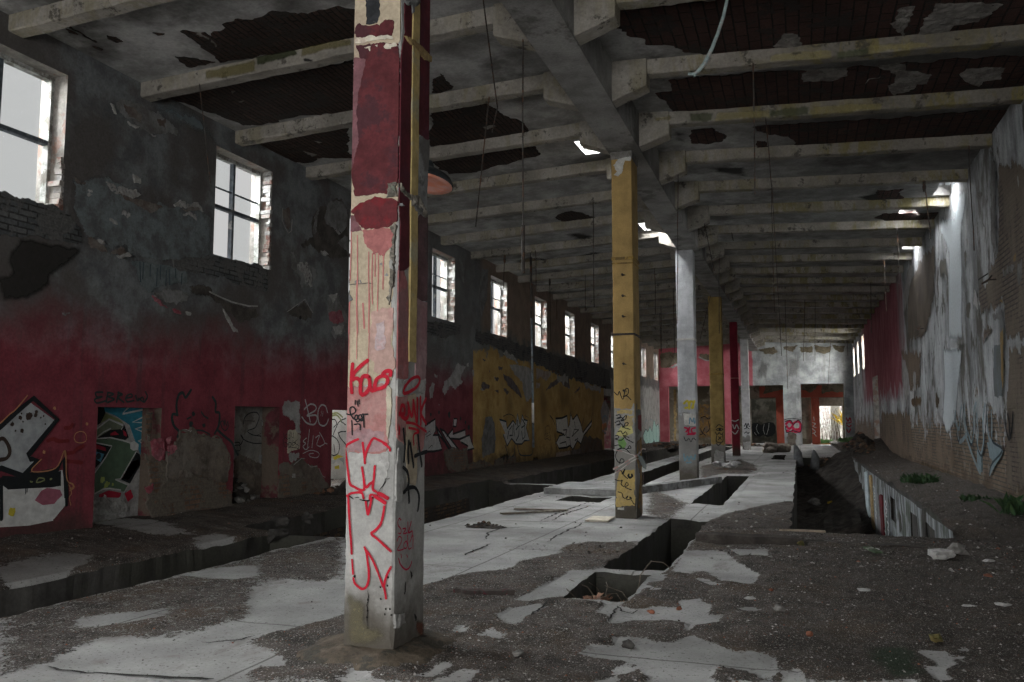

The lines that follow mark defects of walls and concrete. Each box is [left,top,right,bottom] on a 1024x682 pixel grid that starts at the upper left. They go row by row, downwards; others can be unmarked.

peeling [890,2,1003,36]
peeling [175,56,215,68]
peeling [865,63,932,95]
peeling [689,128,727,144]
peeling [0,174,268,292]
spalling [386,223,398,305]
flaking render [904,247,946,345]
flaking render [965,160,1024,494]
peeling [902,357,921,407]